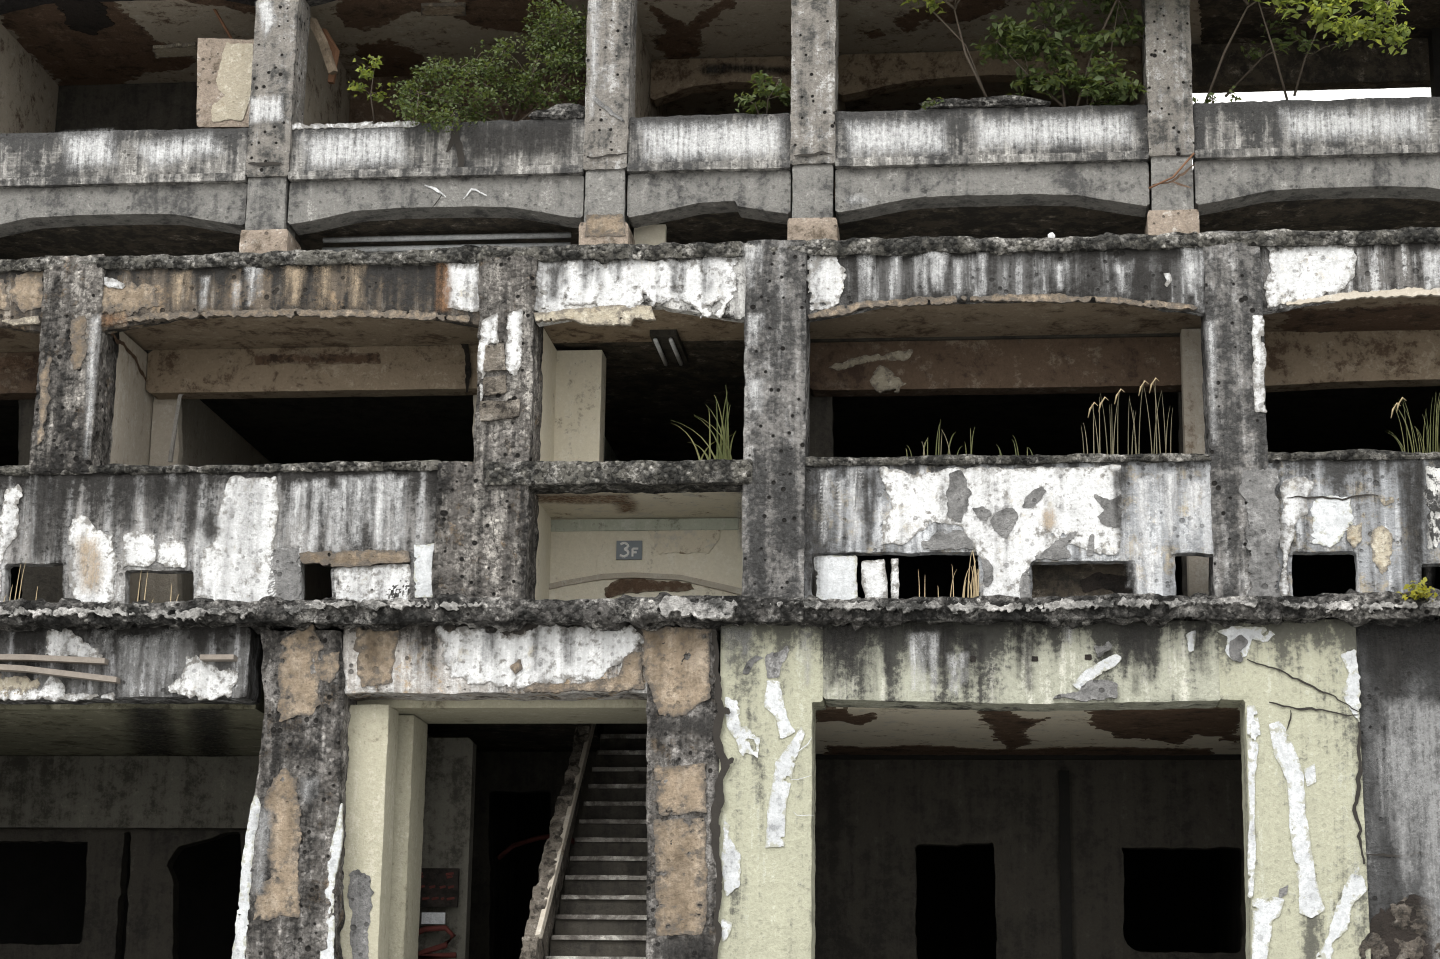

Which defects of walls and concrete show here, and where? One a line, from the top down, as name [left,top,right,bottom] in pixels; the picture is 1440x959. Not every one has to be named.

peeling [445,257,745,422]
damp [32,480,63,557]
damp [80,541,100,589]
damp [115,480,230,539]
damp [293,477,403,550]
peeling [0,475,760,758]
peeling [761,464,1440,614]
spalling [232,768,302,959]
peeling [822,641,1367,959]
crack [1247,659,1440,864]
spalling [1358,894,1440,959]
damp [1371,628,1440,928]